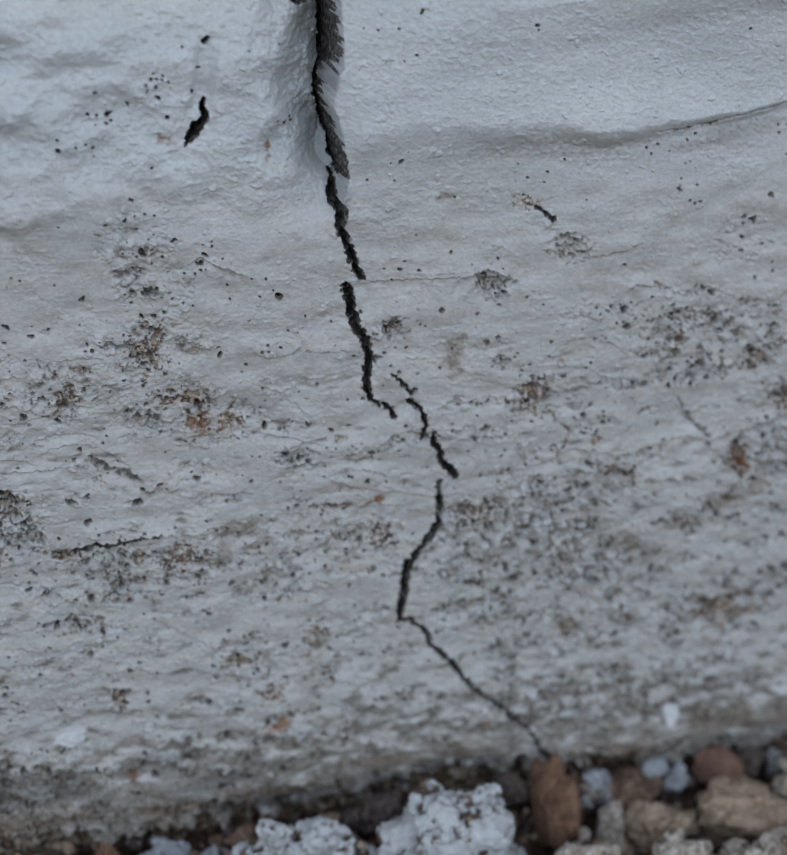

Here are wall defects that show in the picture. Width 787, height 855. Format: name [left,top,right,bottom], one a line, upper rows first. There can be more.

crack [290,0,551,760]